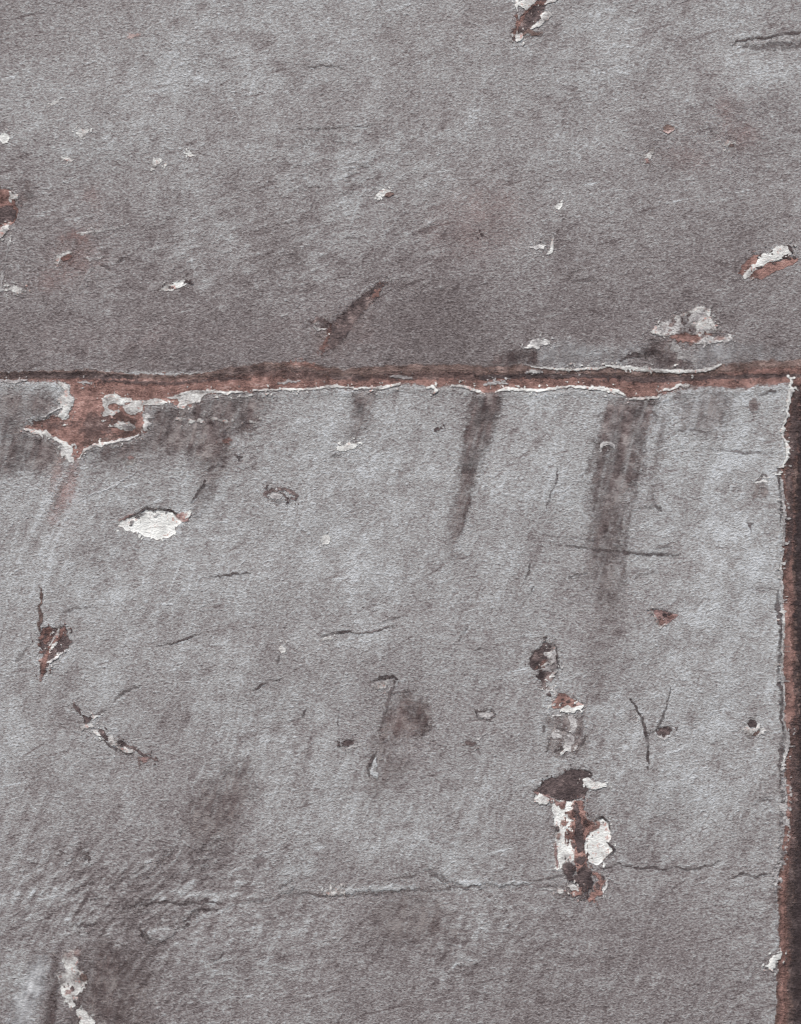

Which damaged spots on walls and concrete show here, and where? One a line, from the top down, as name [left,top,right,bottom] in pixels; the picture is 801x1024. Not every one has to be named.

spalling [511,0,556,45]
peeling [426,306,736,403]
peeling [20,372,412,463]
spalling [116,506,192,542]
water stain [450,392,502,550]
water stain [589,397,657,581]
spalling [32,587,72,681]
corrosion [0,358,801,1024]
spalling [525,636,616,906]
crack [629,687,671,767]
crack [603,861,771,878]
peeling [43,950,95,1024]